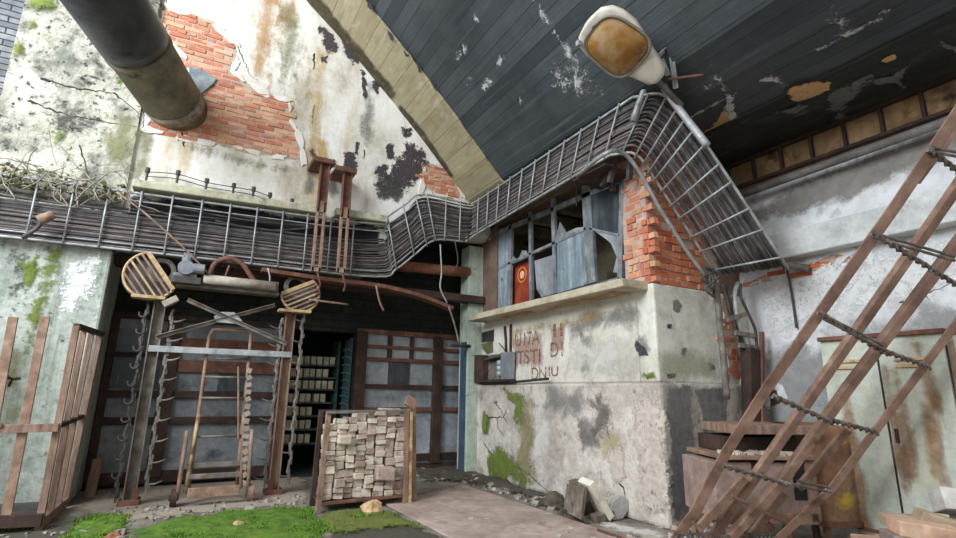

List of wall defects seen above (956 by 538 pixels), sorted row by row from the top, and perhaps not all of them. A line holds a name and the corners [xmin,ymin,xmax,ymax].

water stain [281,7,296,77]
crack [27,78,145,128]
flaking render [138,4,316,166]
water stain [306,0,453,176]
spalling [775,54,908,120]
peeling [333,141,360,169]
water stain [376,176,404,202]
peeling [373,127,466,200]
peeling [743,237,911,338]
peeling [888,237,951,304]
water stain [482,411,490,434]
water stain [530,388,618,458]